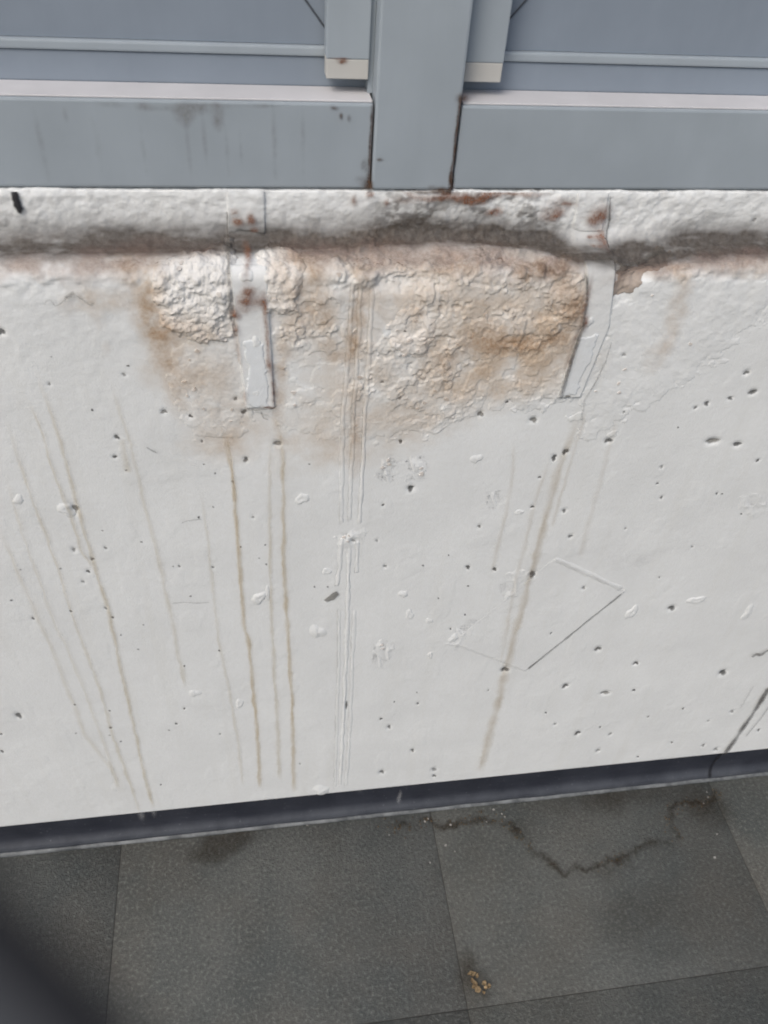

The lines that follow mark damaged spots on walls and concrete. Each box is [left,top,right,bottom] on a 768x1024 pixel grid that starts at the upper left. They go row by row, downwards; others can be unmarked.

rust [588,211,606,246]